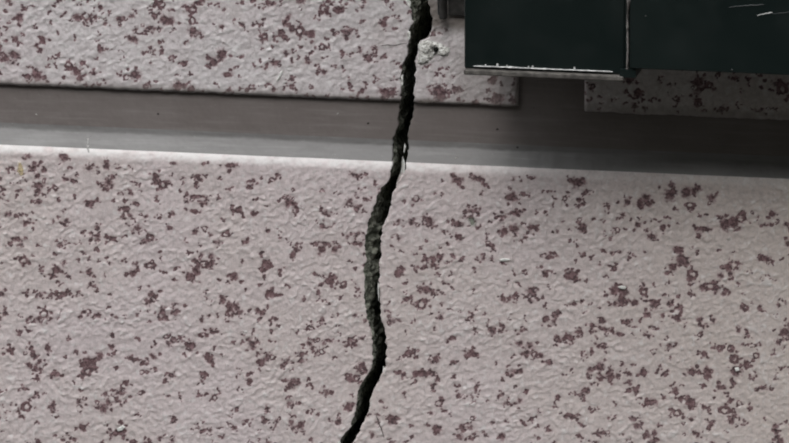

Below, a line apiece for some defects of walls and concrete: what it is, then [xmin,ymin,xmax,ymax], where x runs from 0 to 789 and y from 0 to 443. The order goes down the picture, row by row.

crack [338,0,433,443]